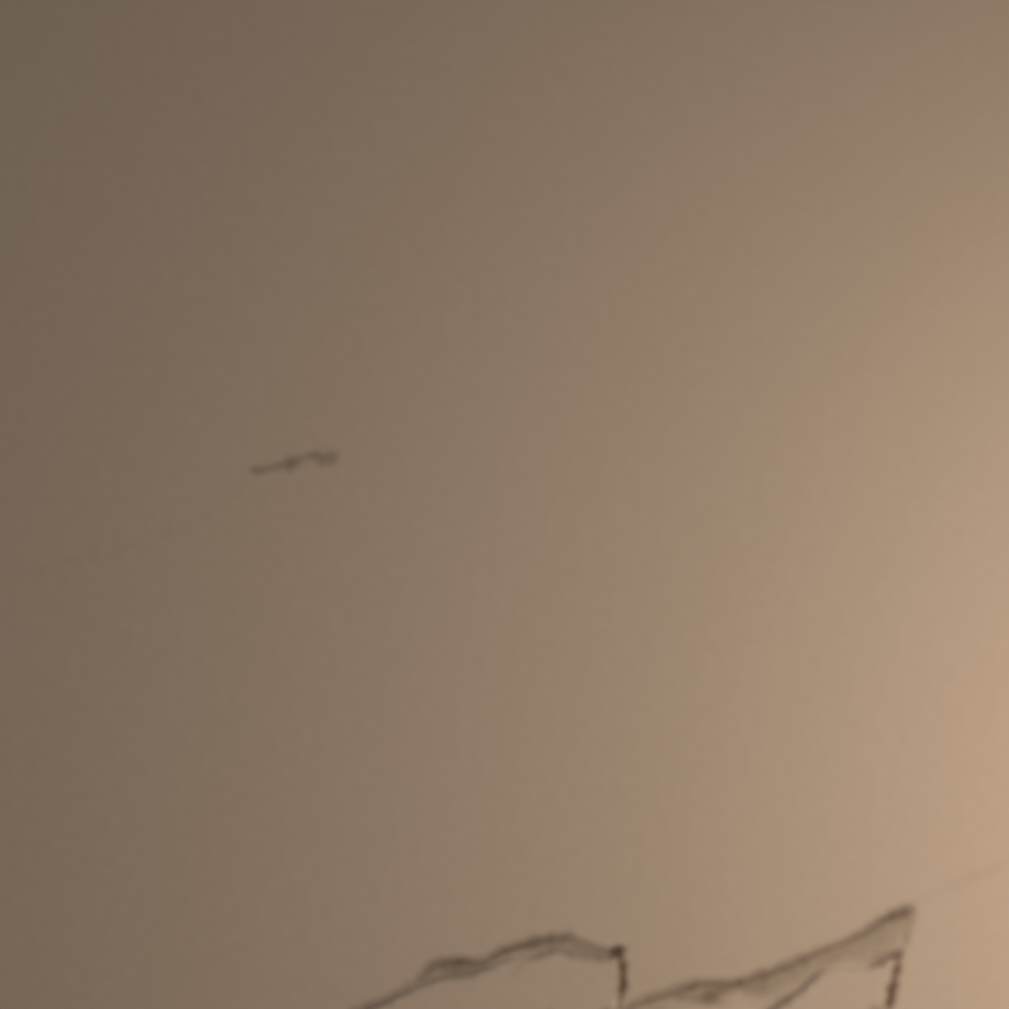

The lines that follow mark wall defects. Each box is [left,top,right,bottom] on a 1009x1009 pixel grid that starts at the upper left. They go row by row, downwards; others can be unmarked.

peeling [372,946,627,1009]
peeling [773,952,902,1009]